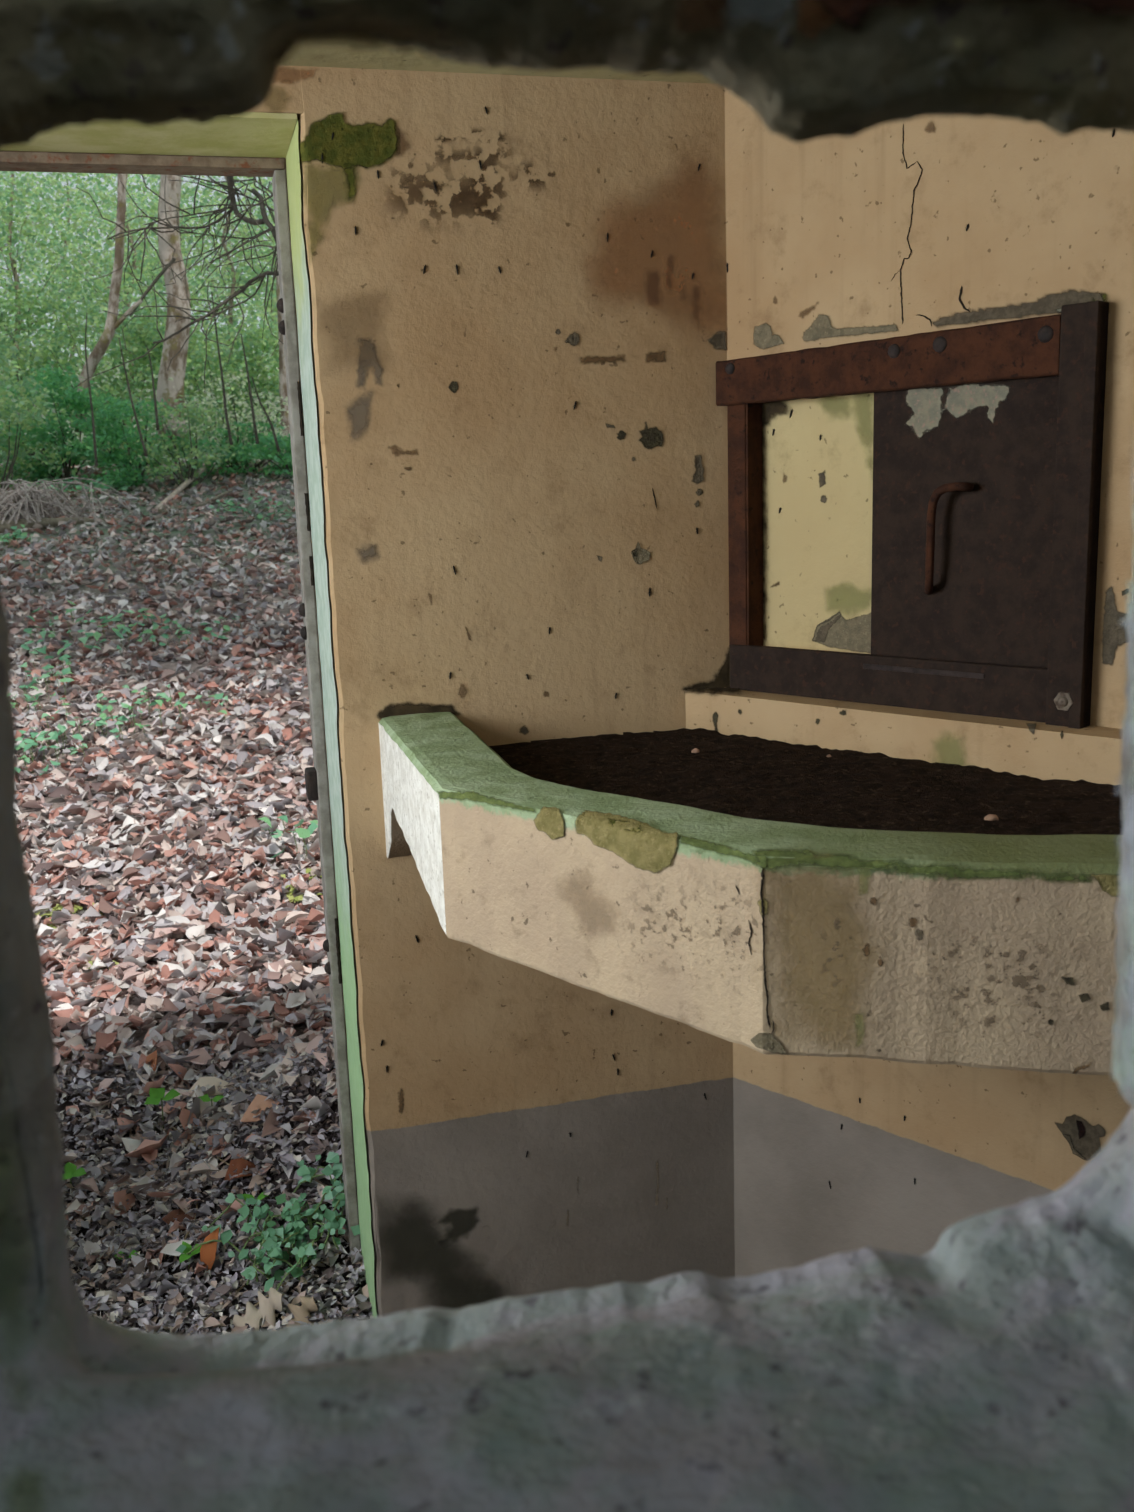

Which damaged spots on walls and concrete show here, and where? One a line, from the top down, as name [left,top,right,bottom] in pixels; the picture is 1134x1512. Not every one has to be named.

crack [892,124,970,326]
spalling [753,323,784,349]
spalling [803,315,897,341]
spalling [932,290,1107,327]
spalling [534,806,678,873]
crack [736,863,774,1034]
hole [1055,1114,1105,1160]